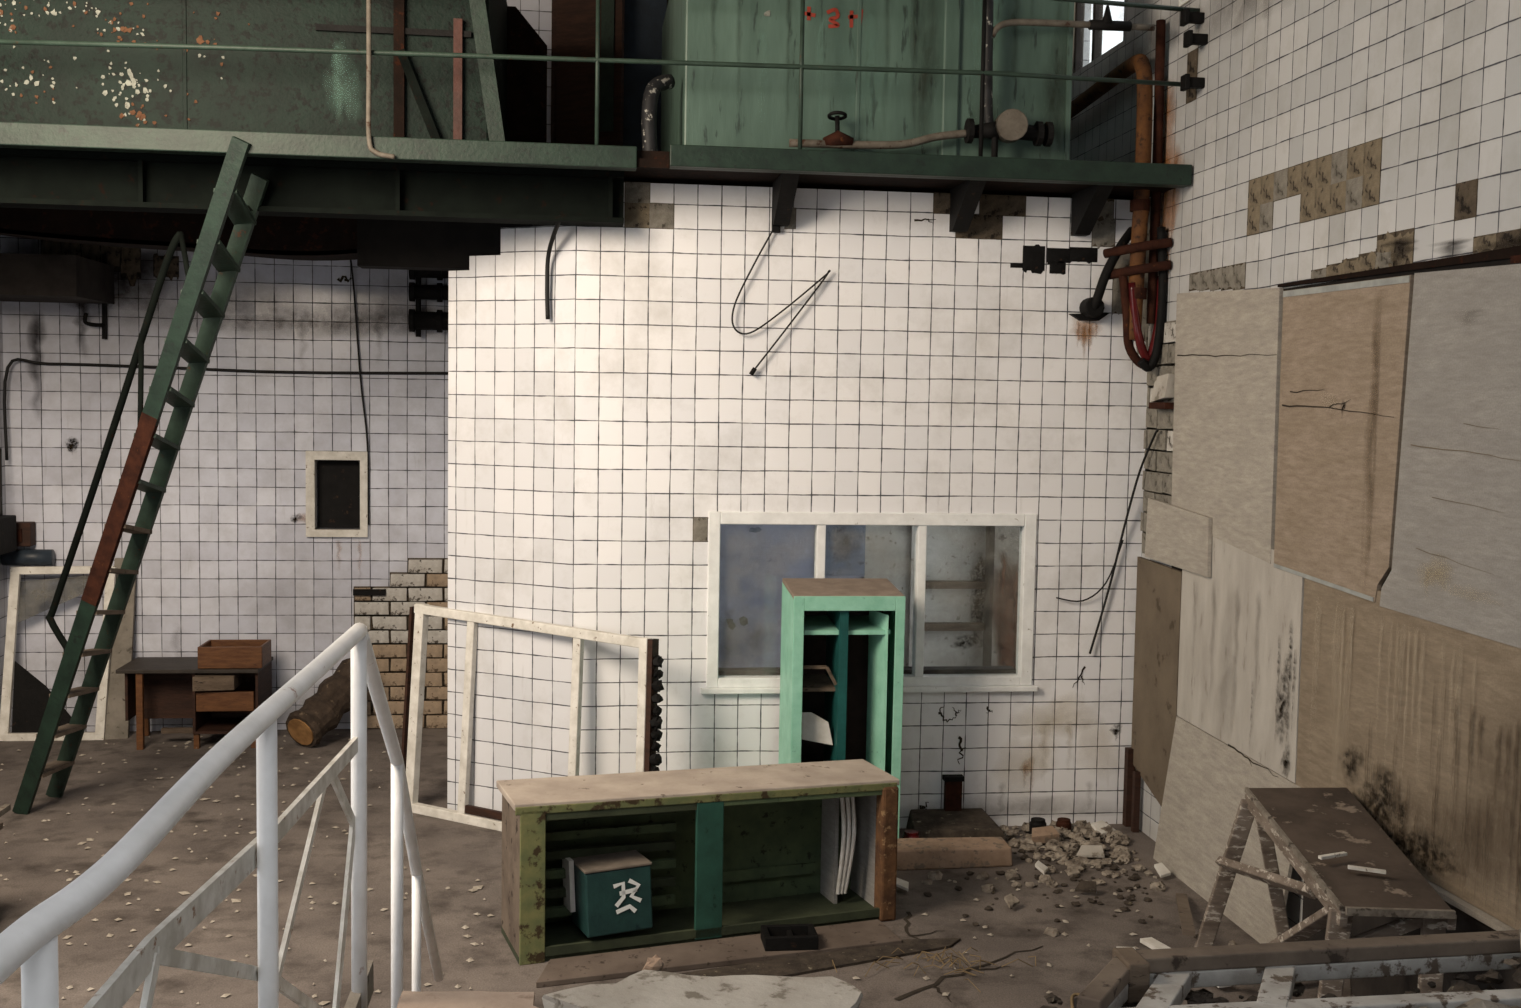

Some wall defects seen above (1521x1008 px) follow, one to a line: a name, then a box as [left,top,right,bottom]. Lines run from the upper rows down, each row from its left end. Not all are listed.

peeling [624,181,674,229]
peeling [933,192,950,214]
peeling [955,194,1026,240]
peeling [1189,262,1246,291]
peeling [1247,137,1383,236]
peeling [1311,228,1415,279]
peeling [1454,178,1478,221]
peeling [1473,228,1521,253]
flaking render [1010,199,1176,554]
flaking render [354,558,448,729]
water stain [1344,752,1455,873]